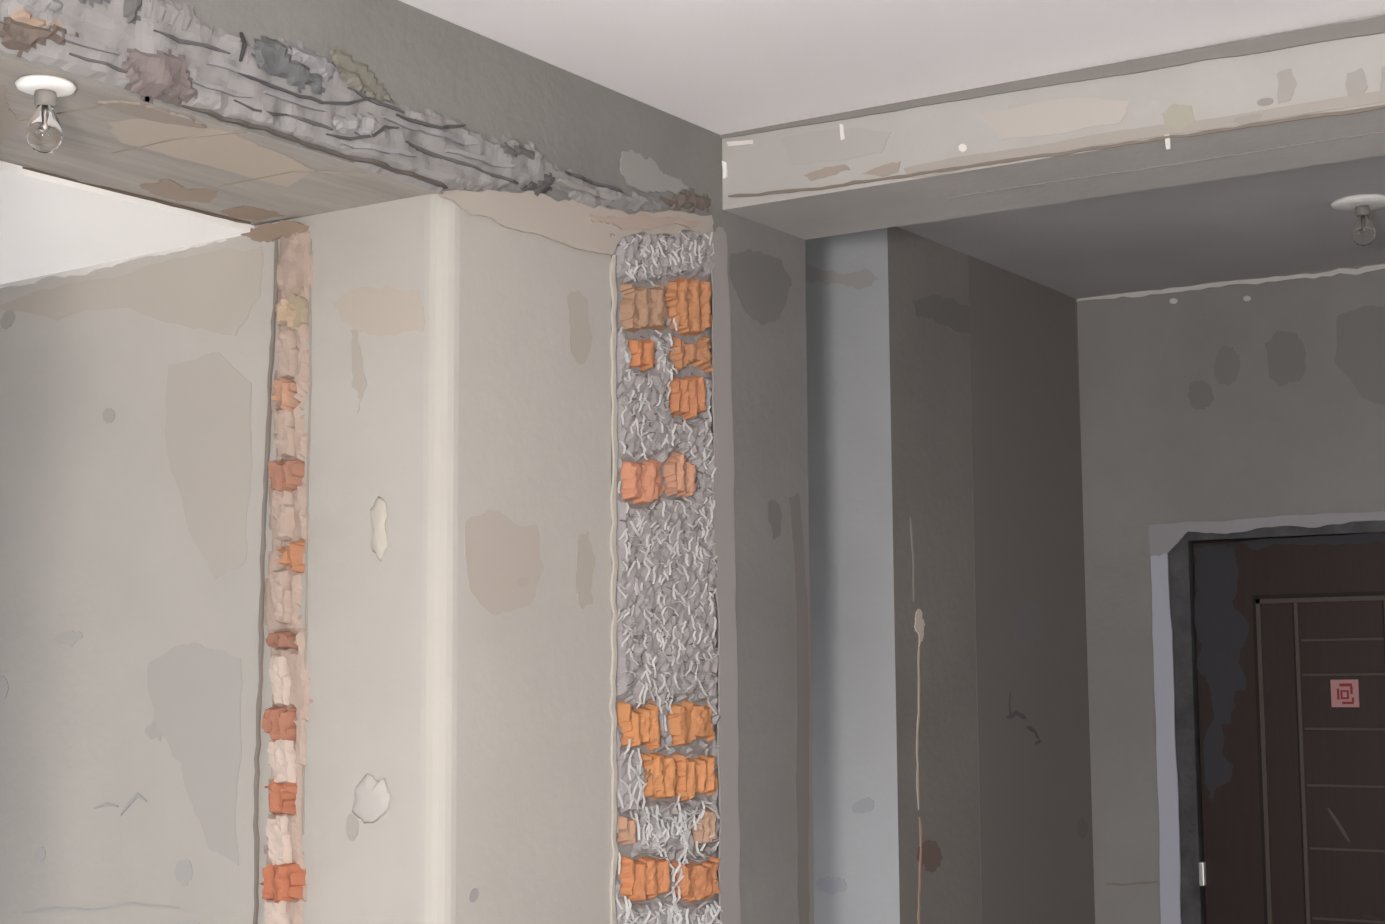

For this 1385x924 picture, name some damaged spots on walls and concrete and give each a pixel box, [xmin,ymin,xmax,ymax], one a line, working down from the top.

crack [69,53,128,73]
crack [153,30,519,189]
spalling [0,0,687,213]
flaking render [241,220,309,242]
flaking render [271,378,298,412]
flaking render [268,459,305,493]
flaking render [275,540,306,573]
spalling [610,230,723,924]
flaking render [266,631,298,651]
flaking render [262,706,297,742]
flaking render [265,779,298,815]
flaking render [260,863,306,903]